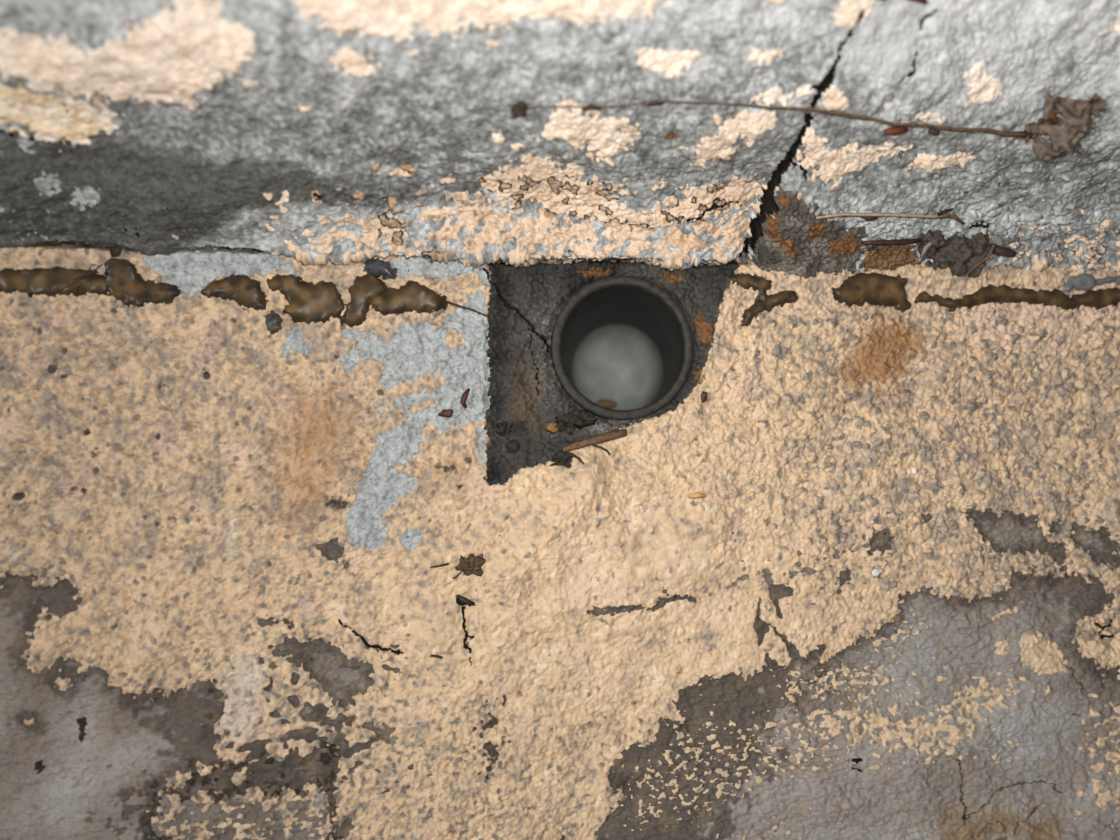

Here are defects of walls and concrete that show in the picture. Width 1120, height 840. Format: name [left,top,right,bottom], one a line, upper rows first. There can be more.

peeling [16,135,35,154]
crack [687,10,865,258]
peeling [33,170,101,211]
peeling [838,167,1067,253]
crack [969,221,991,229]
peeling [280,327,312,357]
corrosion [840,319,924,382]
spalling [315,257,740,563]
crack [338,619,403,655]
crack [456,594,476,666]
peeling [0,570,400,840]
peeling [587,508,1120,840]